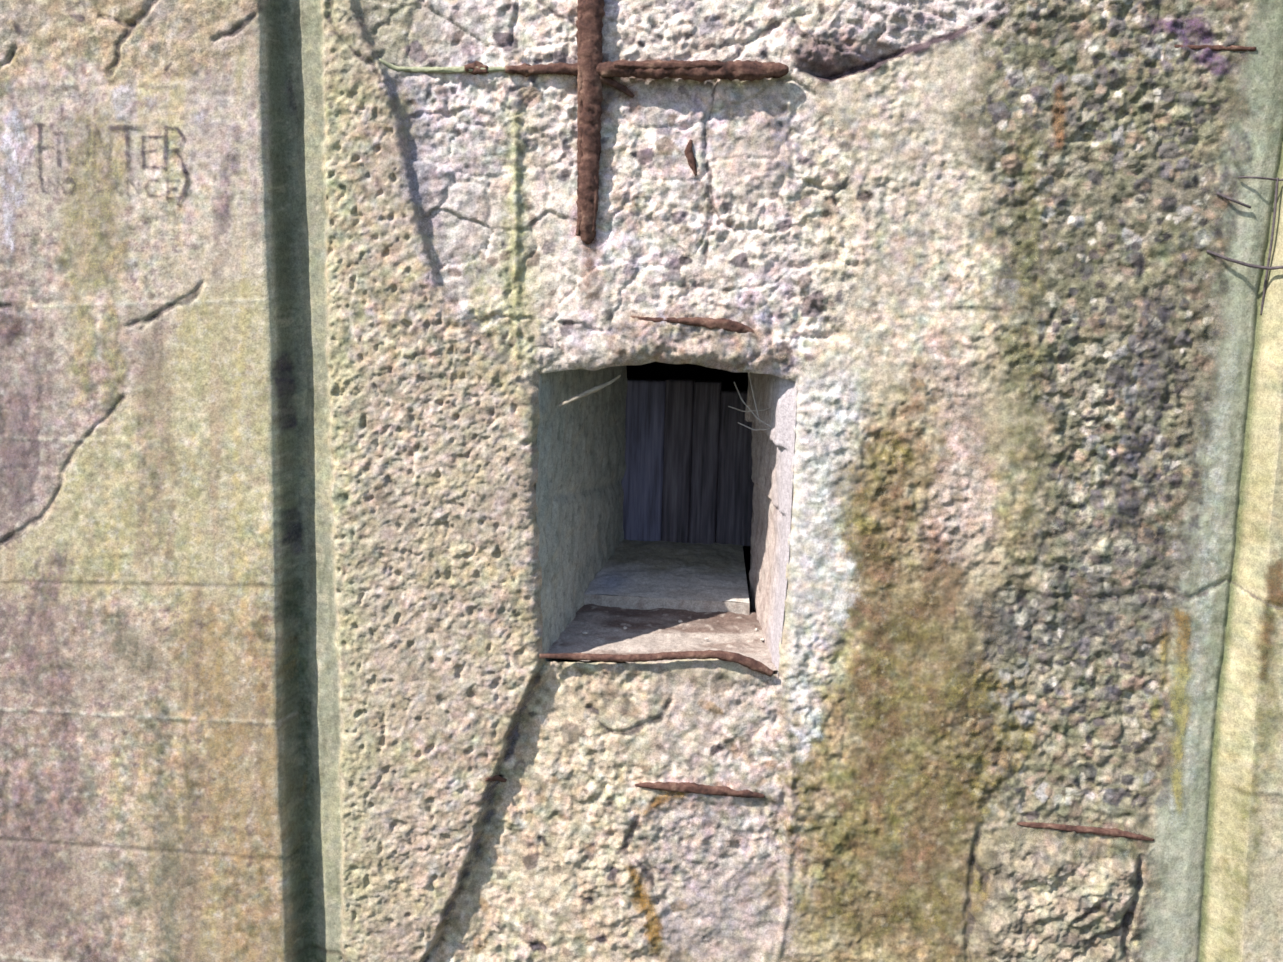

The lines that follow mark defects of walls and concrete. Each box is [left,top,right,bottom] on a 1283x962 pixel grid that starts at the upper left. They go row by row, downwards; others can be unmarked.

corrosion [379,0,789,300]
crack [704,83,719,257]
crack [129,291,198,329]
corrosion [630,316,755,333]
damp [273,354,296,428]
damp [796,373,862,626]
damp [789,653,822,760]
crack [424,676,540,962]
corrosion [635,782,765,815]
corrosion [1017,822,1154,841]
corrosion [628,866,662,953]
crack [1078,855,1143,962]